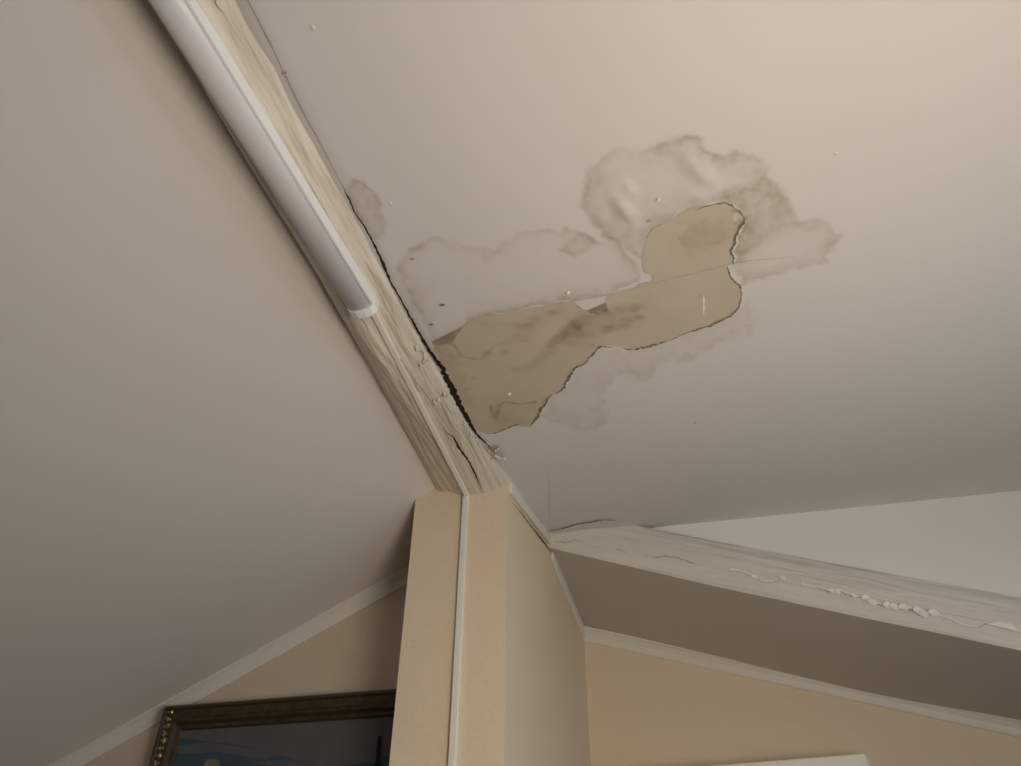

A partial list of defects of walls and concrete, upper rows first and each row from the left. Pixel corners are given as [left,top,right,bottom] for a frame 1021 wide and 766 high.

crack [448,433,482,489]
peeling [415,199,749,461]